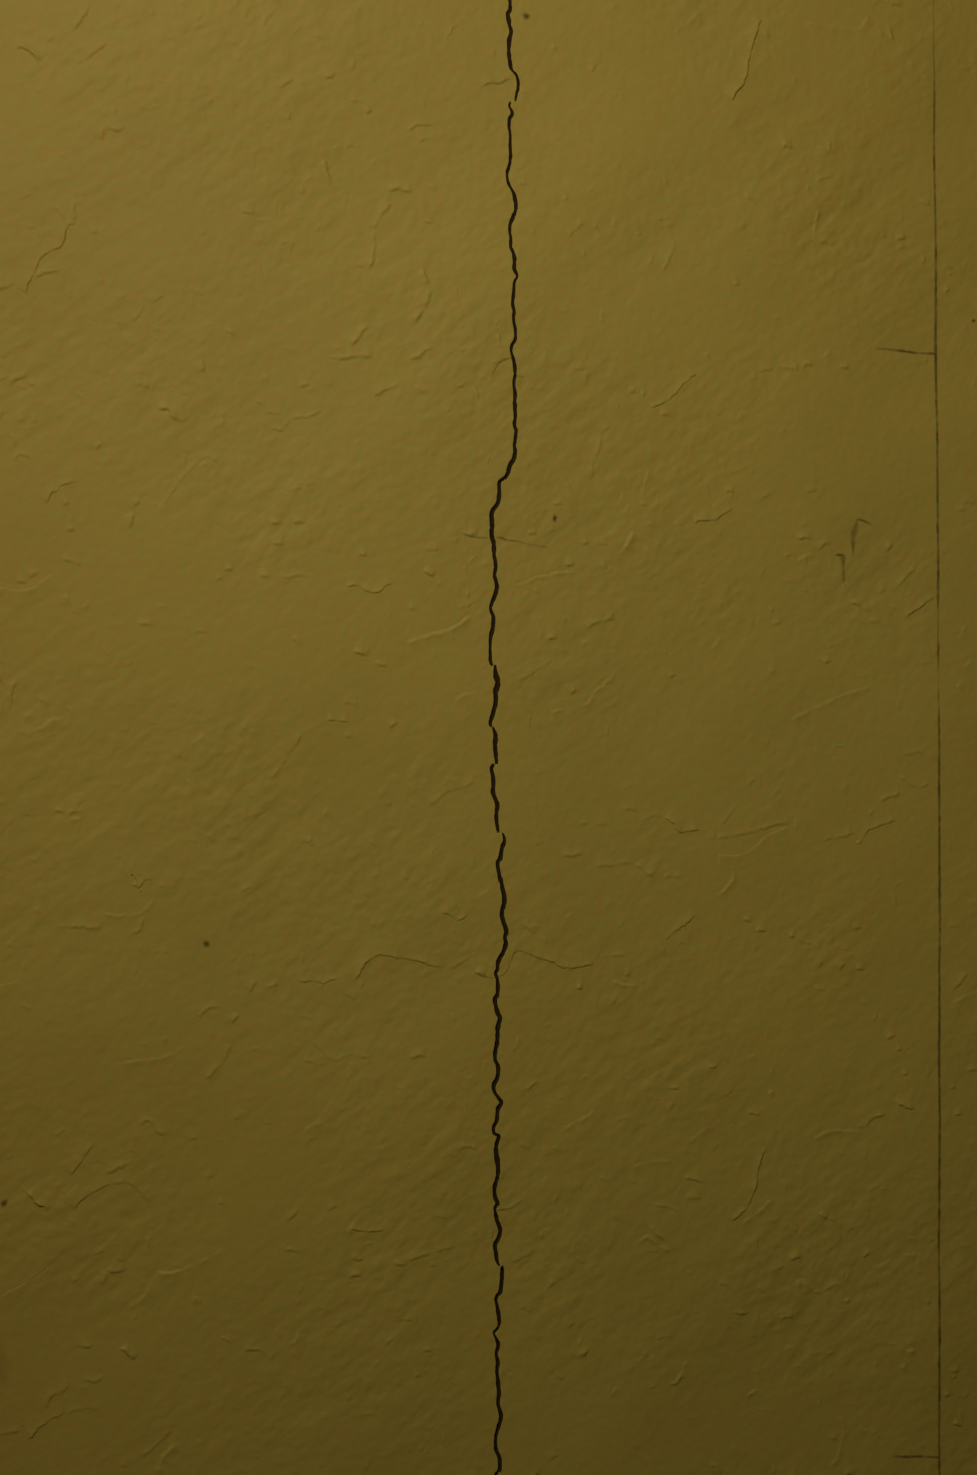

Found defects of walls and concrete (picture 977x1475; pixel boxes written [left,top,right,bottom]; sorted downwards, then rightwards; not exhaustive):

crack [489,0,520,1475]